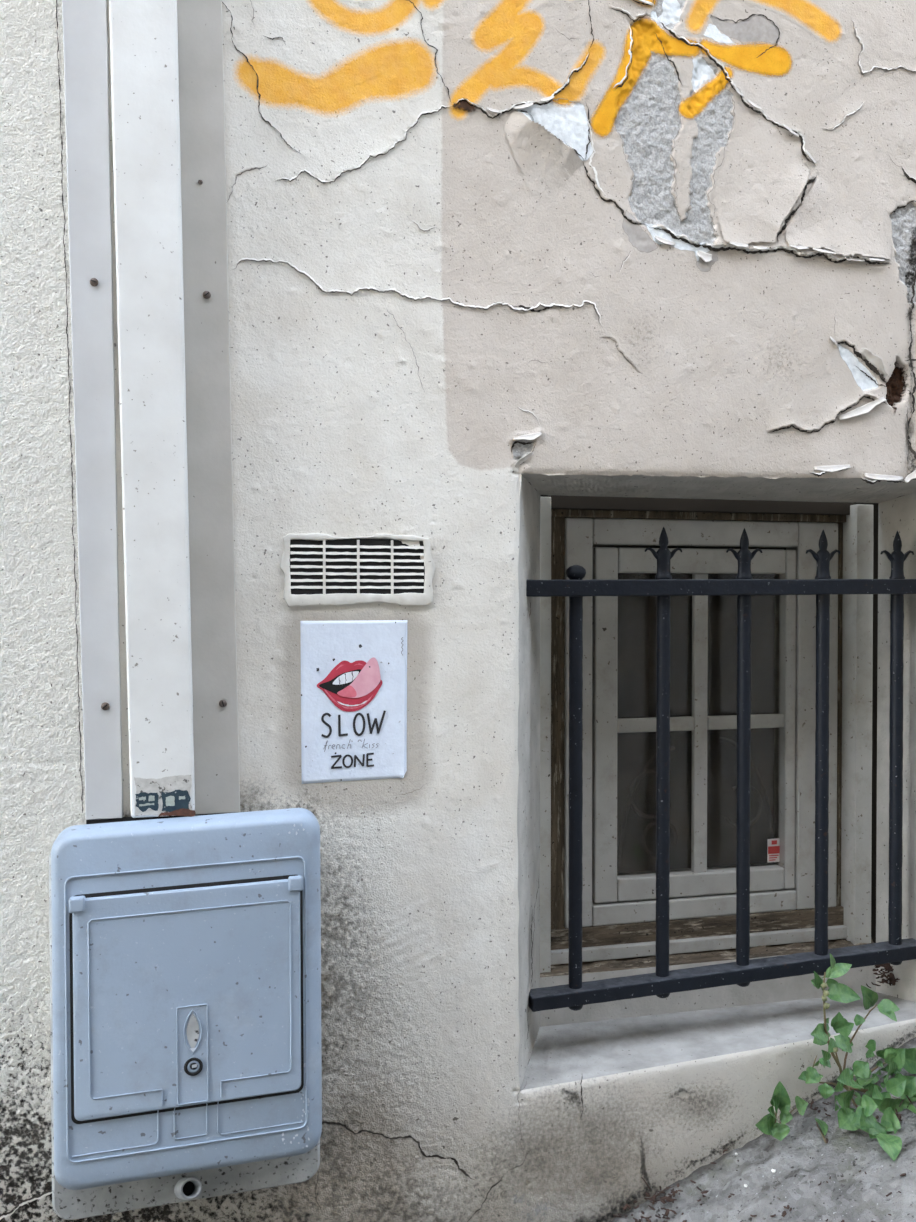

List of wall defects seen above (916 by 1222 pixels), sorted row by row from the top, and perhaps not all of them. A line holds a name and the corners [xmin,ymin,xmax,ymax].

peeling [704,14,780,58]
peeling [517,101,606,195]
flaking render [611,0,735,272]
crack [222,0,916,484]
flaking render [889,200,916,304]
peeling [769,317,889,433]
crack [527,877,539,1039]
leakage [0,1029,308,1222]
crack [322,1081,531,1220]